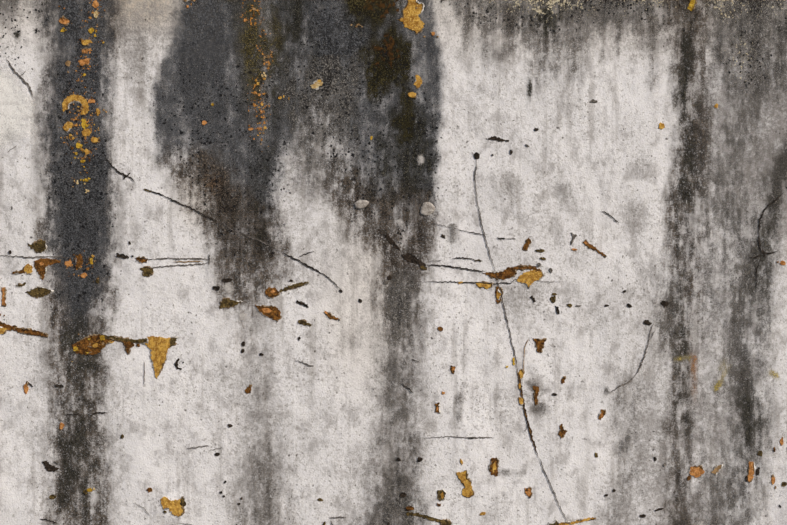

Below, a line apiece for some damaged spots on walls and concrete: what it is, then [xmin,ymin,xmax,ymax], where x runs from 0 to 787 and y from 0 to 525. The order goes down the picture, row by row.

damp [147,0,444,346]
peeling [0,239,99,338]
damp [0,0,119,525]
peeling [71,333,184,378]
peeling [476,238,553,304]
crack [471,152,567,520]
damp [456,0,787,525]
crack [610,324,655,393]
crack [750,192,784,292]
peeling [160,496,186,517]
damp [239,434,279,525]
peeling [456,459,474,498]